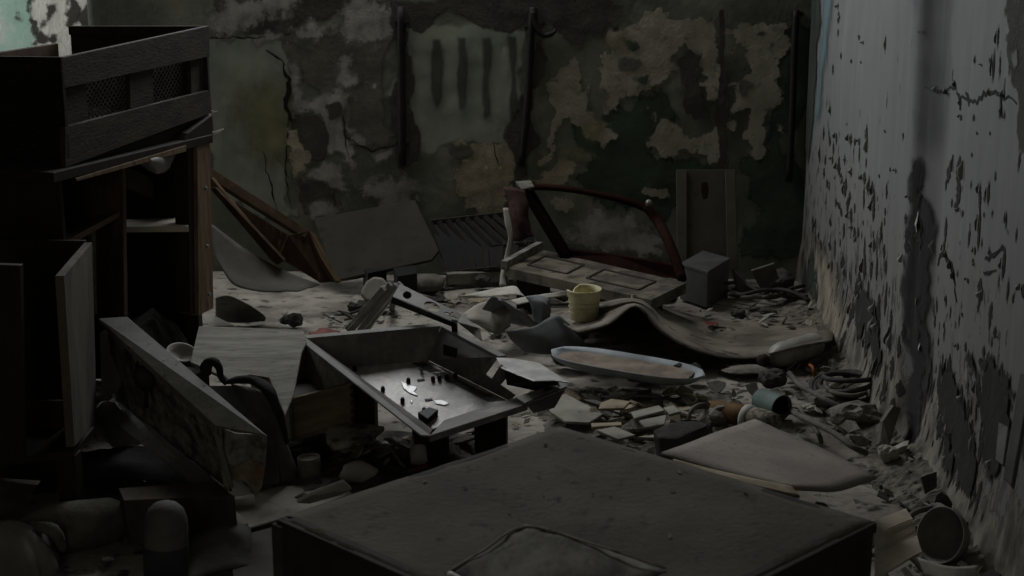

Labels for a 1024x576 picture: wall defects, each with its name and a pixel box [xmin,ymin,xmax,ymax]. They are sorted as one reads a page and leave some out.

peeling [15,0,88,57]
crack [210,36,293,210]
peeling [209,34,366,219]
flaking render [449,6,791,214]
peeling [805,0,926,406]
crack [930,69,1016,118]
peeling [973,0,1024,173]
peeling [924,152,1024,522]